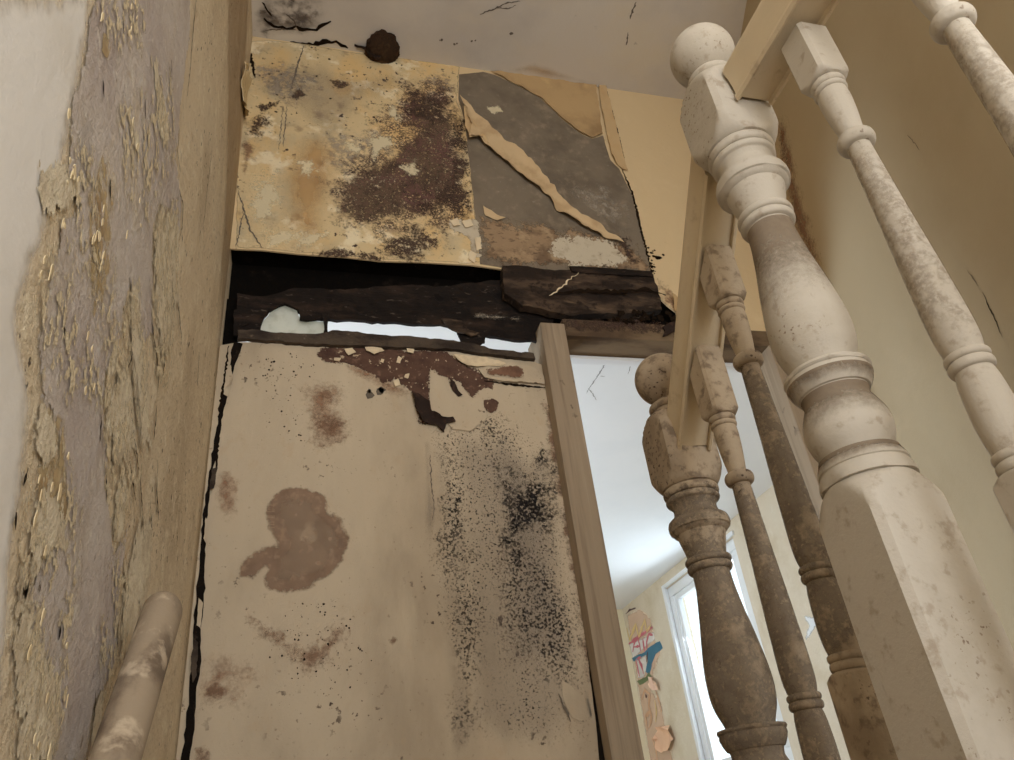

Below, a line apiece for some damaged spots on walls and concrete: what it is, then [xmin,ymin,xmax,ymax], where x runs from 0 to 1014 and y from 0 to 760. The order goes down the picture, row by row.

crack [262,2,348,149]
leakage [319,69,472,263]
flaking render [200,72,650,356]
flaking render [10,0,212,760]
crack [128,324,165,383]
crack [197,346,229,468]
peeling [317,347,506,432]
spalling [591,301,676,325]
crack [130,408,159,532]
leakage [240,488,349,592]
leakage [436,418,575,726]